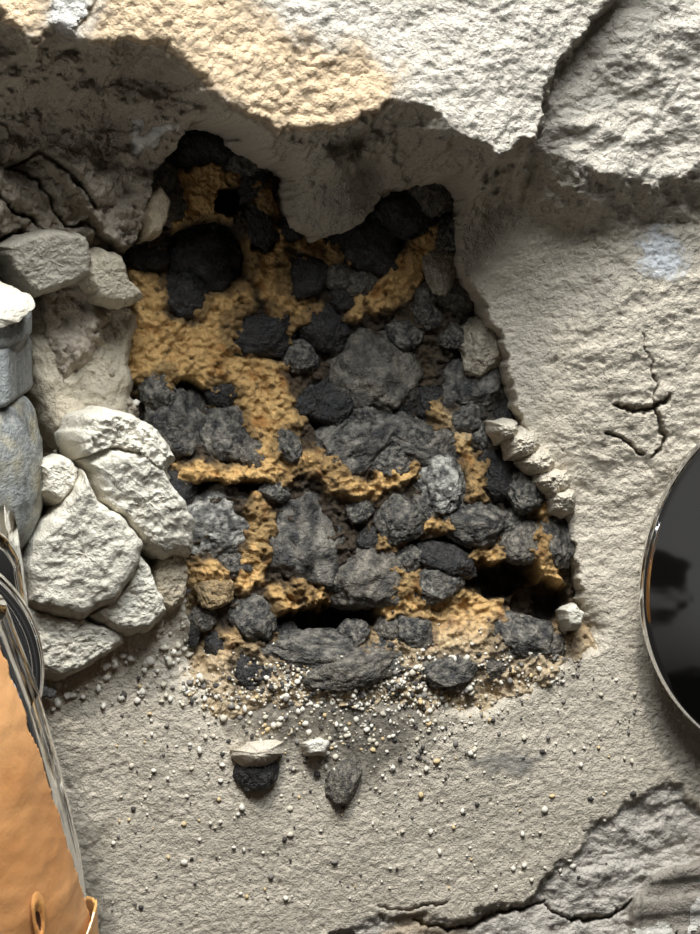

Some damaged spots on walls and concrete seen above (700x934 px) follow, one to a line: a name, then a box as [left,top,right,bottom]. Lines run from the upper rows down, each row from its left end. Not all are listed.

peeling [49,0,90,35]
spalling [0,41,598,720]
crack [605,373,669,455]
crack [384,901,629,932]